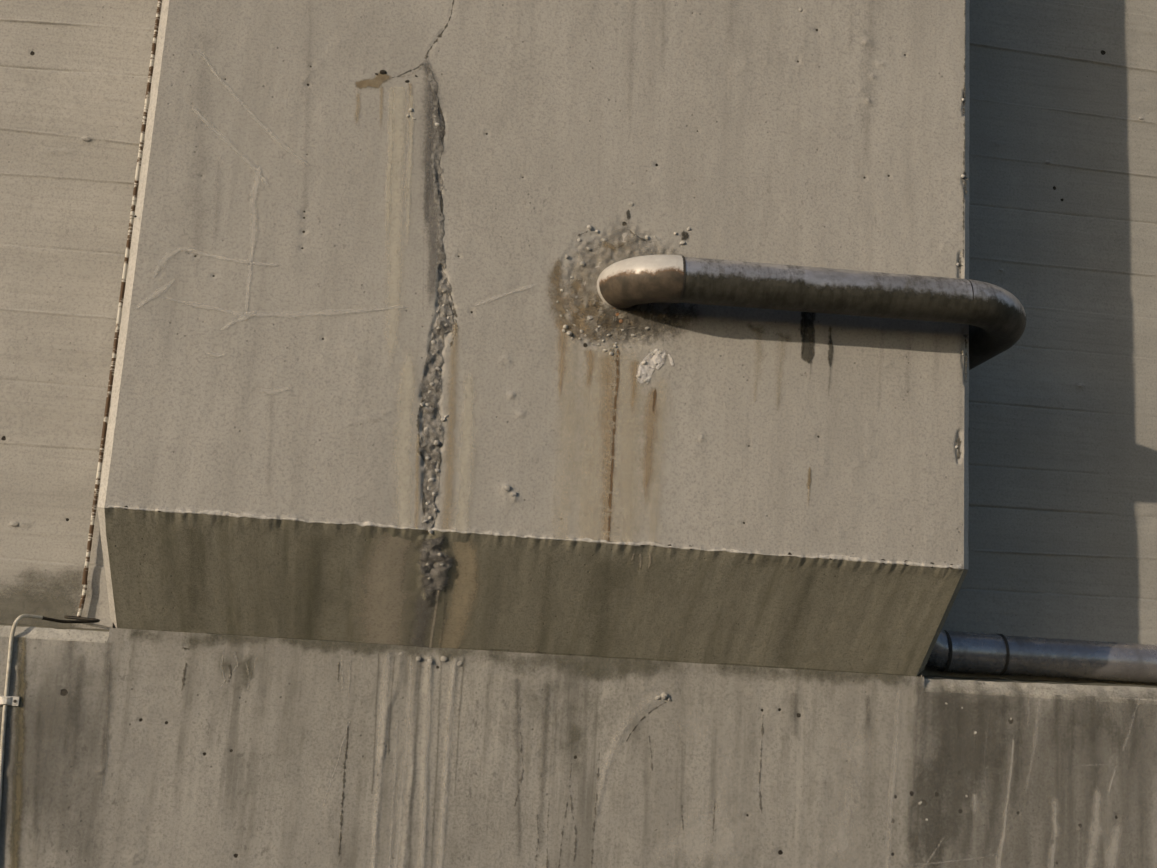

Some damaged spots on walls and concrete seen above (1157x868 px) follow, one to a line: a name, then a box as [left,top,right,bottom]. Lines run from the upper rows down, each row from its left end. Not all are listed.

crack [392,0,457,534]
spalling [551,202,697,355]
water stain [800,312,833,366]
rust [588,350,637,542]
rust [645,389,656,487]
water stain [0,572,81,868]
water stain [339,727,349,854]
water stain [997,741,1014,868]
water stain [1088,771,1118,868]